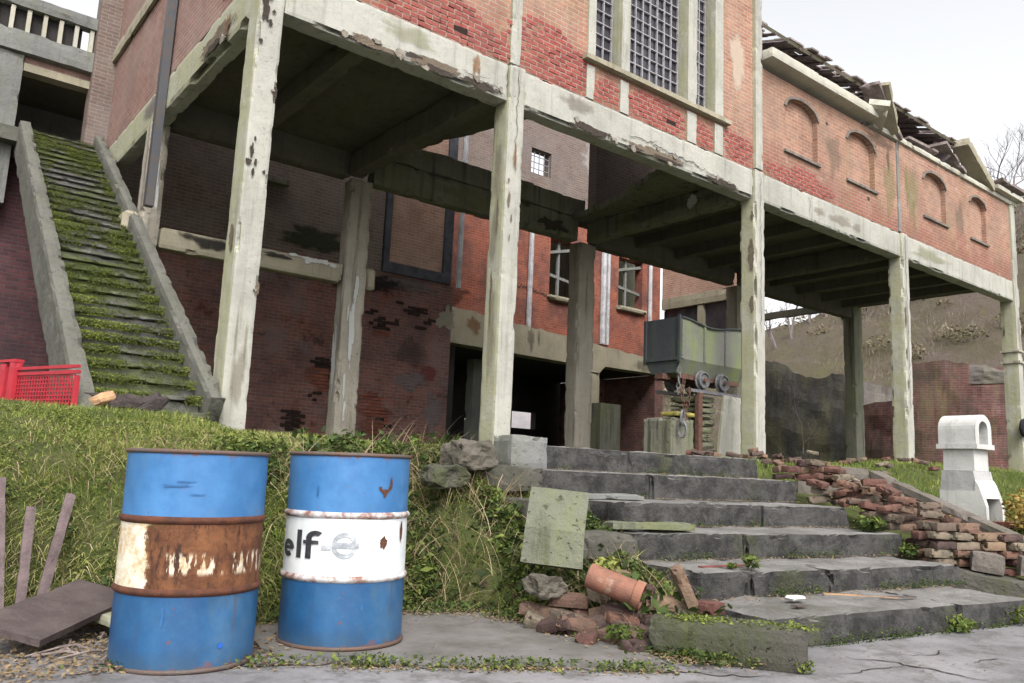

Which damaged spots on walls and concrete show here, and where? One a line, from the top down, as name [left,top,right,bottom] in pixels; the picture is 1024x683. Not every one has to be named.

spalling [200,13,237,62]
spalling [341,29,503,93]
spalling [371,0,835,200]
spalling [246,136,265,176]
spalling [304,275,470,437]